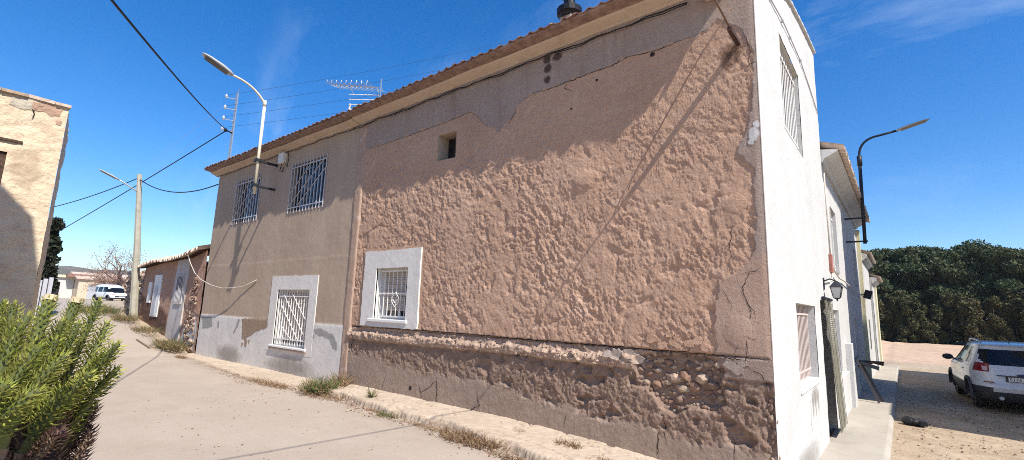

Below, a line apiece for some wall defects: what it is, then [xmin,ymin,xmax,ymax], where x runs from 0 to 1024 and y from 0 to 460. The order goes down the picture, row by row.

flaking render [233,317,268,347]
spalling [351,331,748,412]
crack [351,227,772,397]